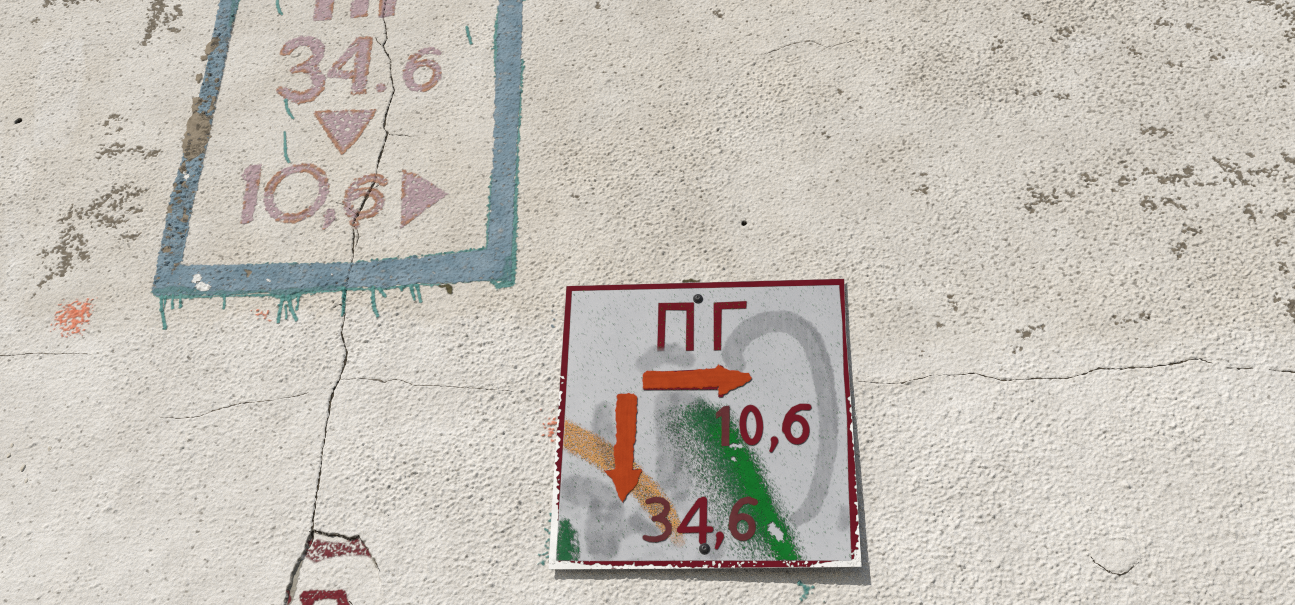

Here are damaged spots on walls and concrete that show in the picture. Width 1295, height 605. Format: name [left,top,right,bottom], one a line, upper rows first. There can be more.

crack [160,0,509,530]
crack [859,358,1295,384]
flaking render [284,529,380,605]